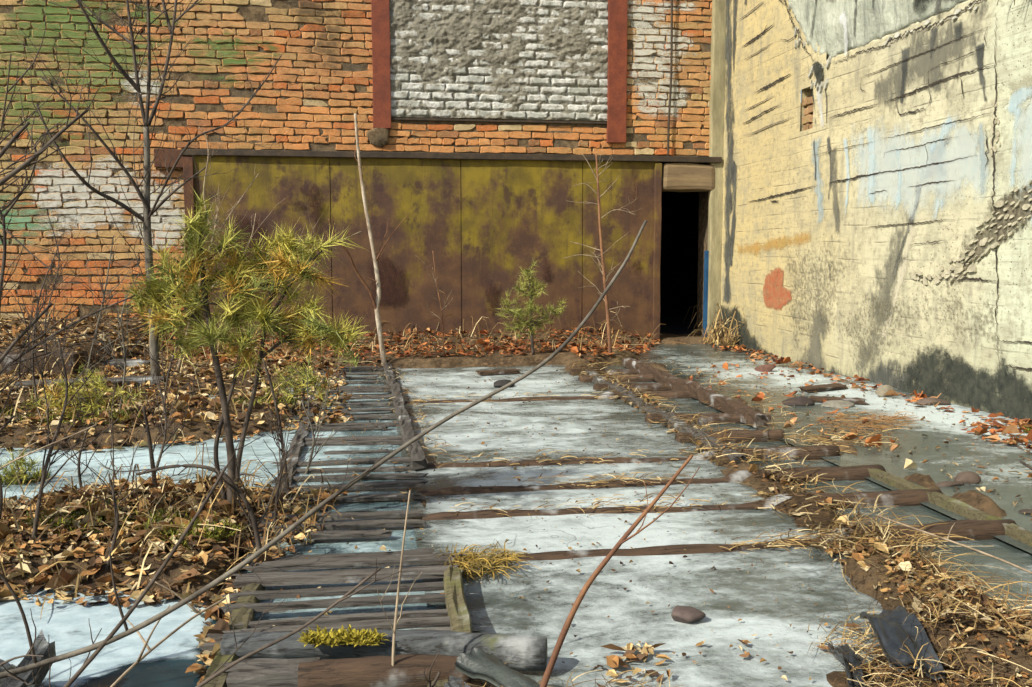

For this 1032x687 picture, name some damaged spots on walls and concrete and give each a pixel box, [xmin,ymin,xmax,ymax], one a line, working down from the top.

leakage [874,0,987,104]
corrosion [227,215,265,258]
corrosion [367,255,405,306]
leakage [802,310,839,374]
crack [739,0,1032,371]
spalling [784,180,1032,361]
leakage [856,185,1032,424]